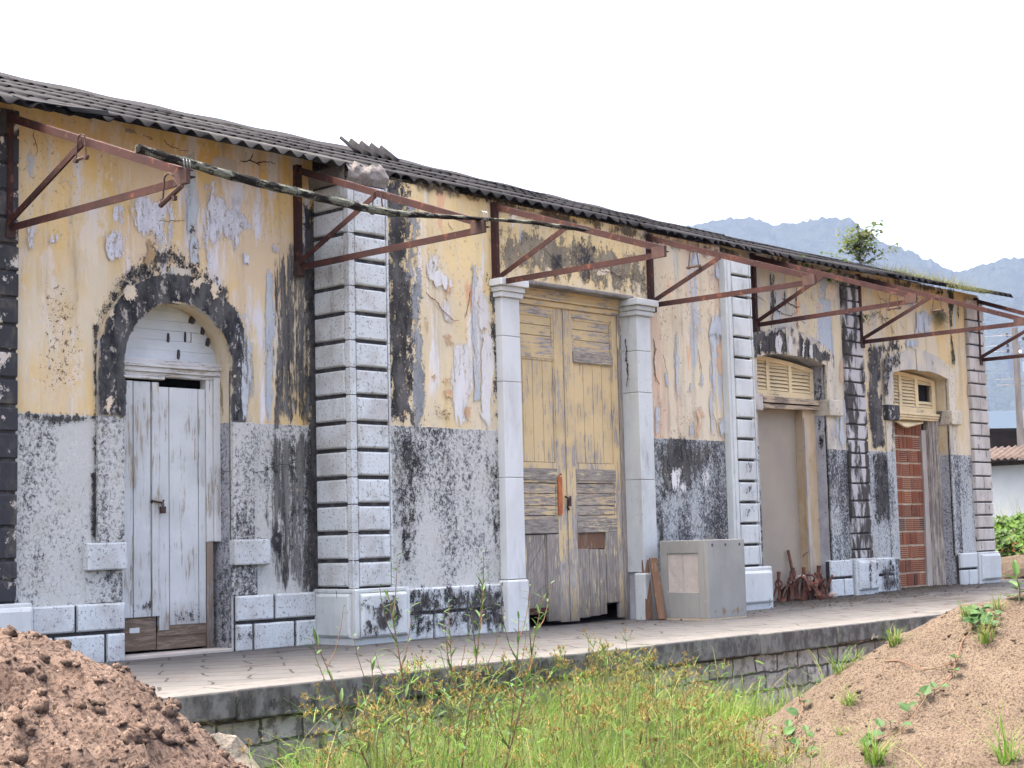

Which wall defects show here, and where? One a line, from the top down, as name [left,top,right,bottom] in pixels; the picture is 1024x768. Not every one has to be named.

peeling [105,152,252,267]
damp [25,225,246,427]
damp [265,203,320,592]
peeling [425,249,495,431]
damp [386,178,681,570]
mould [654,437,716,548]
peeling [655,313,725,438]
damp [866,340,903,528]
mould [213,574,262,647]